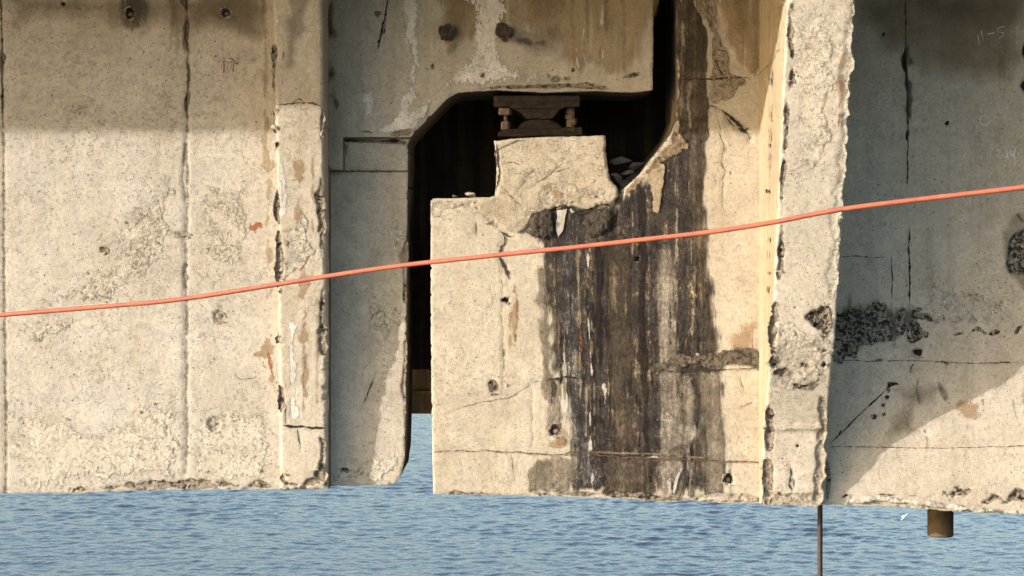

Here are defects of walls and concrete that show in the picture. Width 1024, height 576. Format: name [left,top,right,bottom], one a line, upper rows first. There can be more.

spalling [768,3,796,89]
spalling [273,190,288,294]
spalling [314,167,335,253]
damp [528,0,725,500]
spalling [625,132,688,213]
crack [677,50,778,212]
spalling [767,103,789,200]
spalling [824,4,855,297]
spalling [766,225,834,390]
peeling [10,385,397,492]
crack [434,224,765,503]
crack [832,359,1024,449]